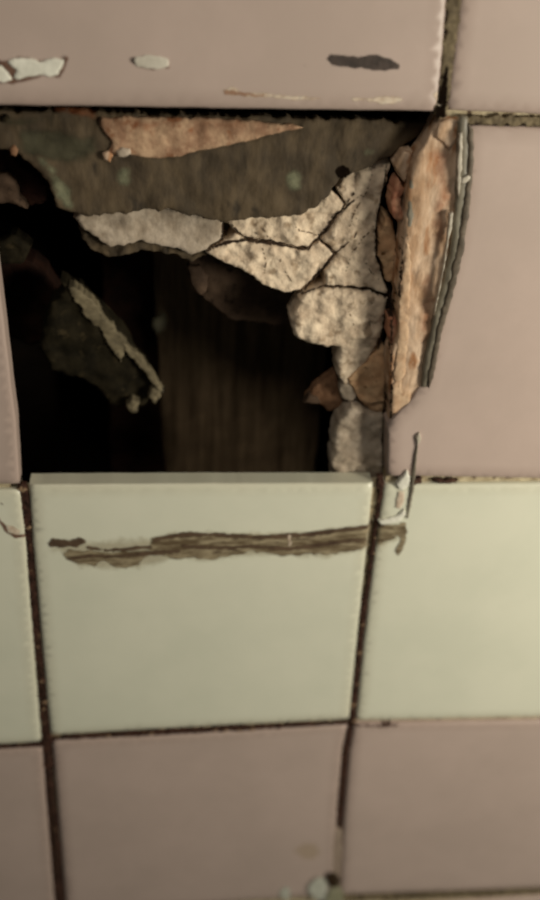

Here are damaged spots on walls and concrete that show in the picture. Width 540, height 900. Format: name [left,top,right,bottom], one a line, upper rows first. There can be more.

spalling [0,56,68,84]
spalling [131,55,170,70]
flaking render [0,105,458,483]
crack [206,167,404,473]